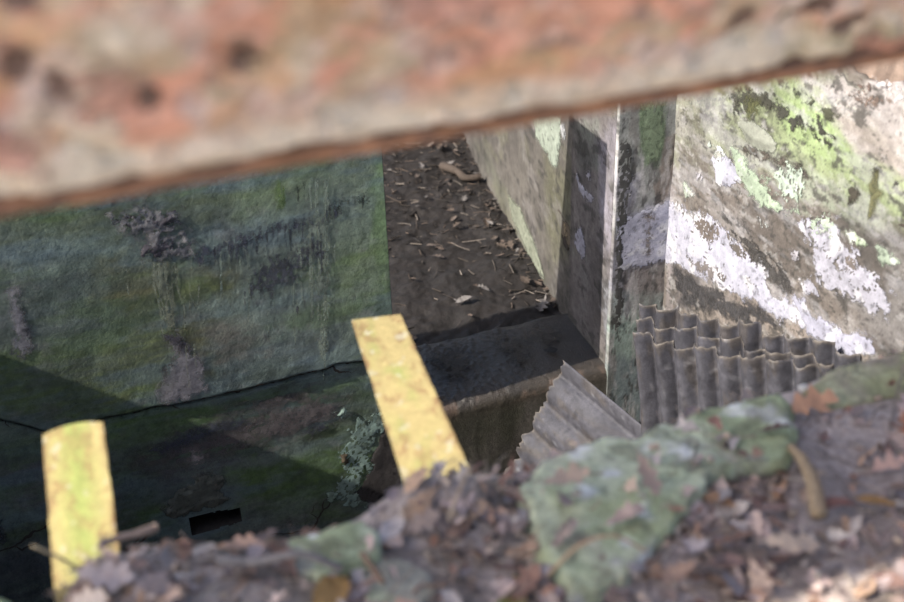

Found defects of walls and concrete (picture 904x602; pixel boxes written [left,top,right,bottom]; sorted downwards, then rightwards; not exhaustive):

leakage [153,261,200,334]
leakage [191,178,368,378]
crack [93,361,363,422]